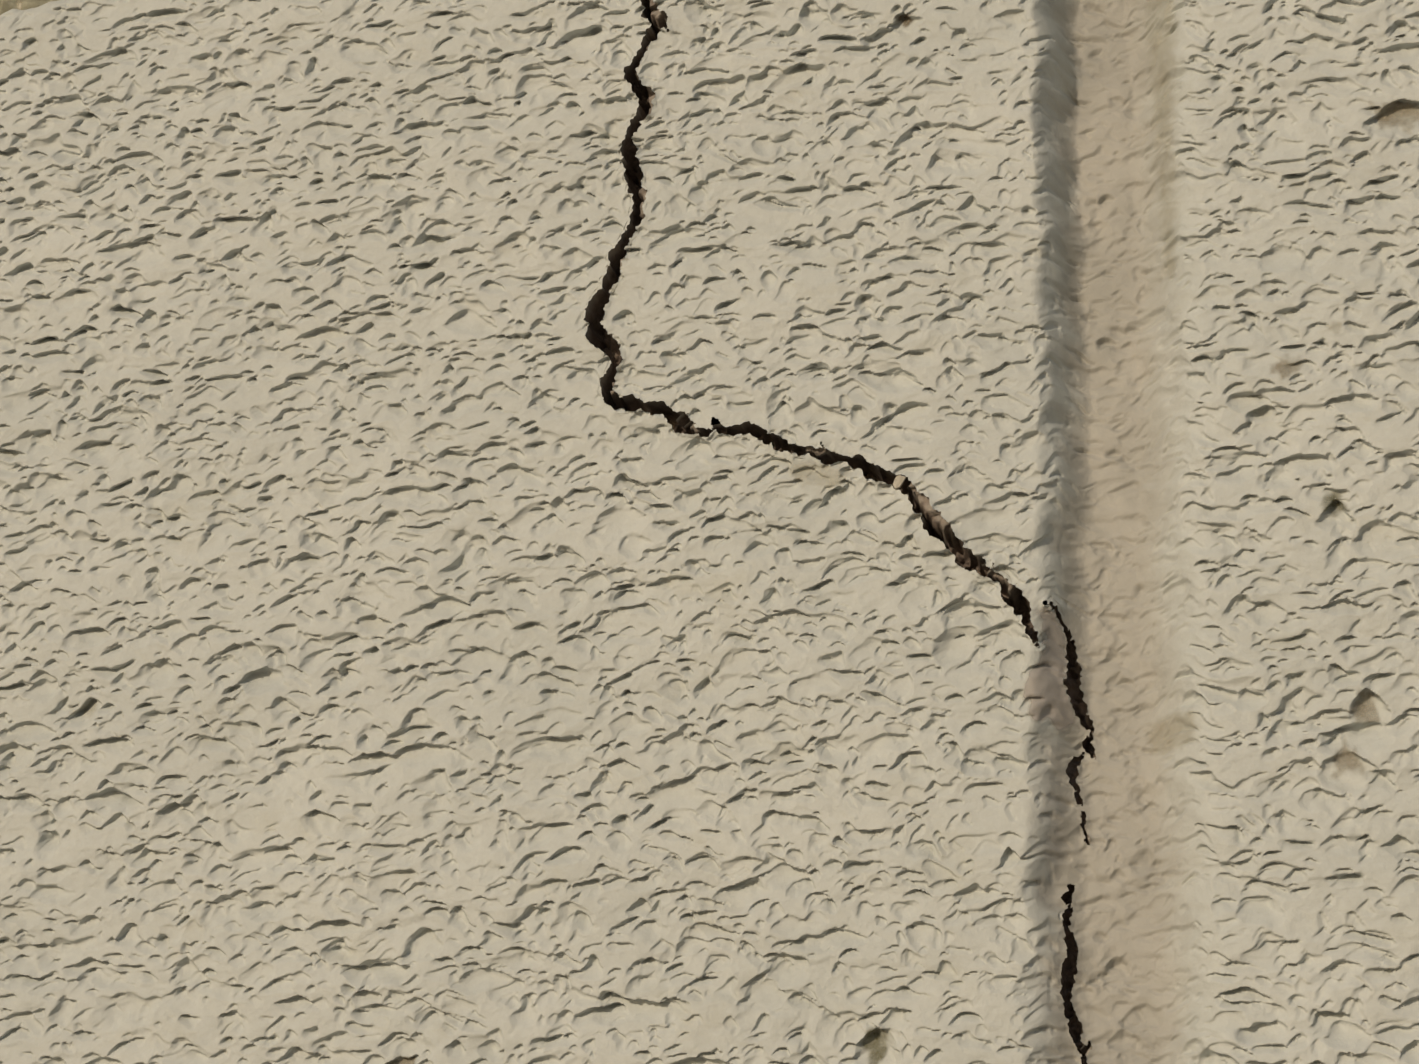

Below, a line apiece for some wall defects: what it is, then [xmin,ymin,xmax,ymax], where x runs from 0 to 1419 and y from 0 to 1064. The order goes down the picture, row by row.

crack [583,0,1097,848]
crack [1058,884,1097,1064]